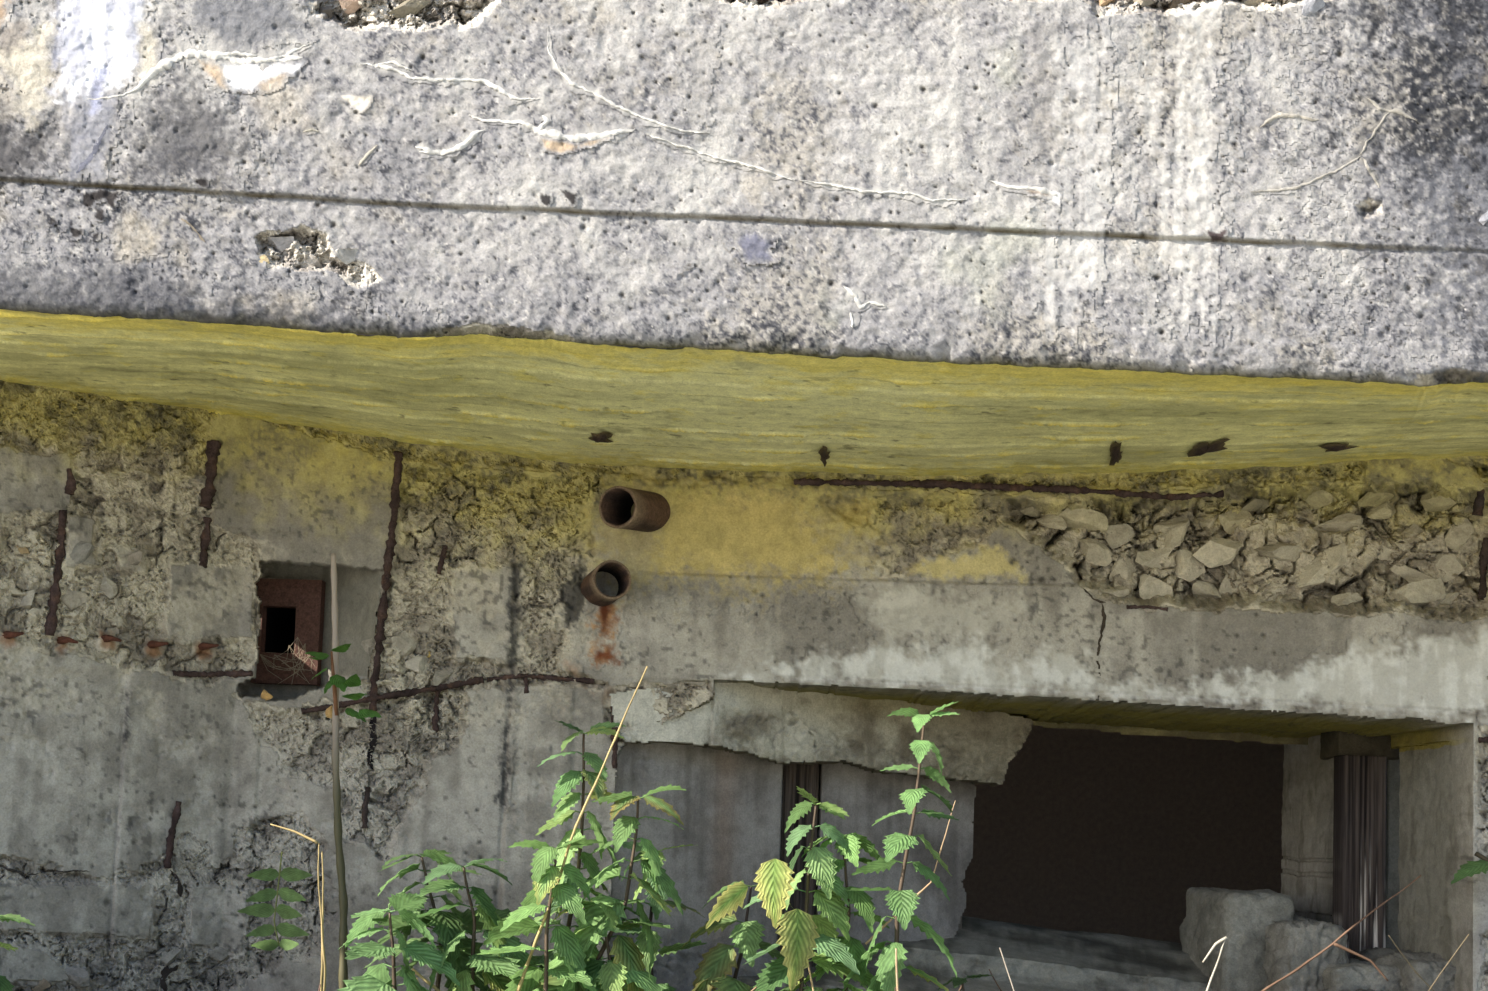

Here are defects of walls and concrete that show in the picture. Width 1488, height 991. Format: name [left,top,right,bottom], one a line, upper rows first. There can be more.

spalling [308,0,502,33]
spalling [715,0,818,11]
spalling [1083,0,1196,18]
spalling [1222,0,1325,16]
crack [76,36,311,173]
crack [358,25,1063,207]
spalling [253,224,381,288]
rust [199,440,222,568]
spalling [658,456,1488,624]
rust [301,451,628,768]
spalling [0,380,713,991]
spalling [1473,726,1488,860]